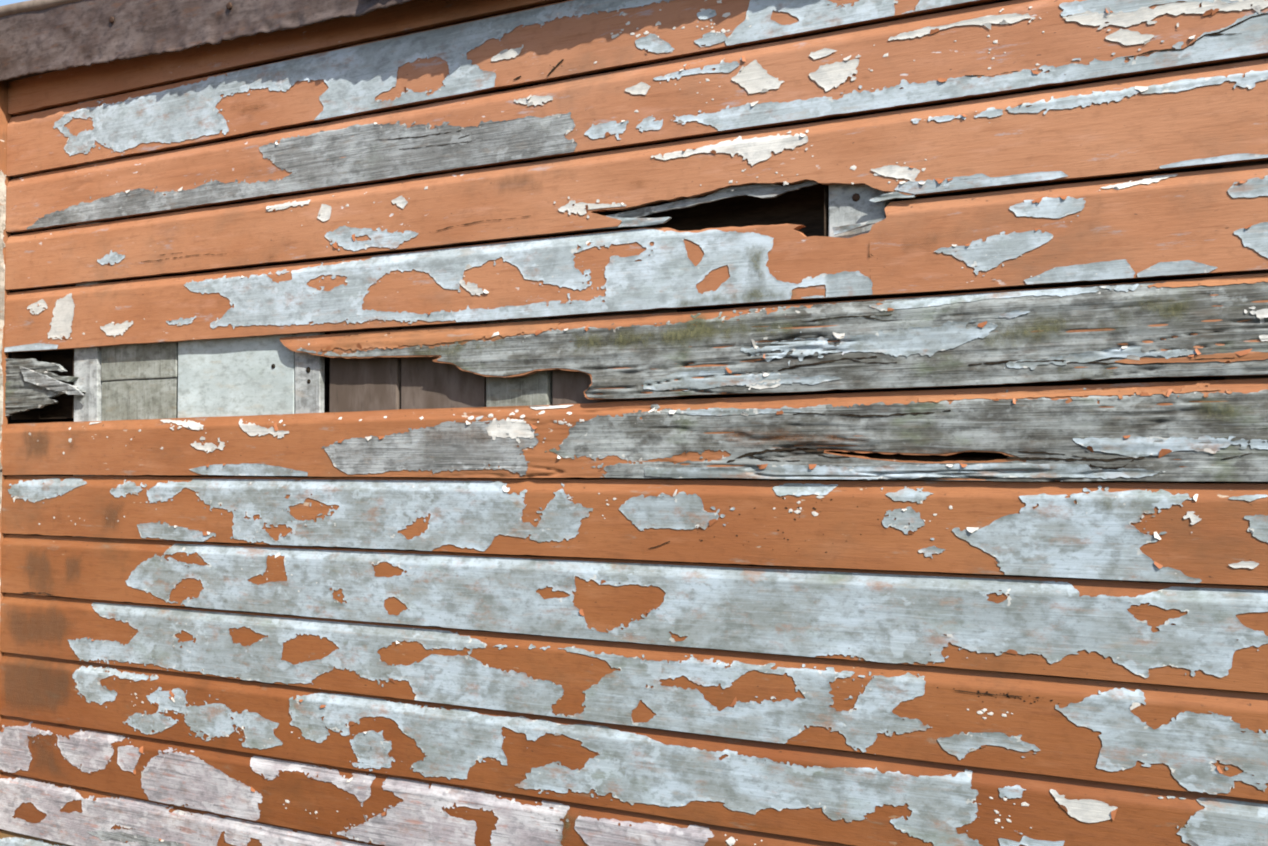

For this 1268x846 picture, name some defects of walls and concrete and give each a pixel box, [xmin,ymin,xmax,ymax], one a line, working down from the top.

peeling [0,171,87,511]
peeling [0,405,1268,846]
peeling [27,0,1268,391]
crack [727,448,849,463]
crack [793,409,951,417]